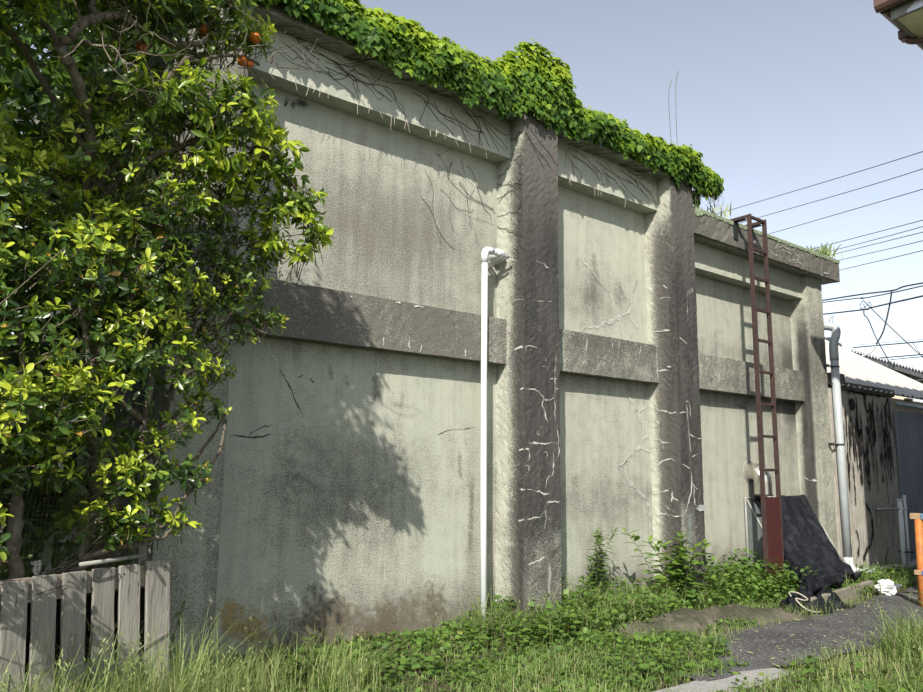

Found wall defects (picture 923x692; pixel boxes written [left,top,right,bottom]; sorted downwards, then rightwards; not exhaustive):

crack [230,425,272,439]
crack [267,342,314,414]
crack [515,345,560,466]
crack [519,489,559,528]
crack [617,393,704,529]
water stain [843,390,895,560]